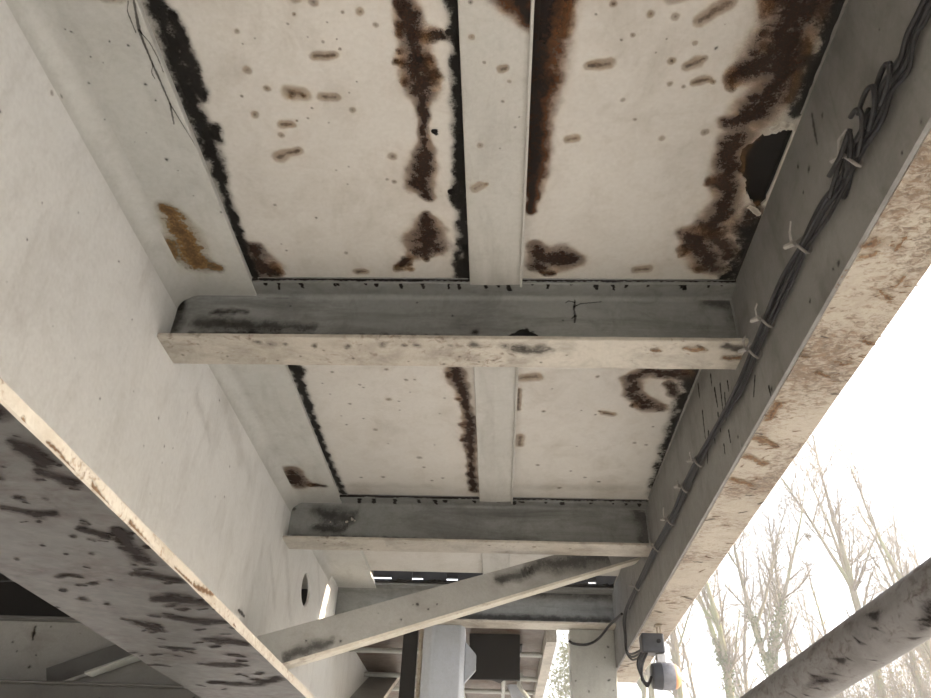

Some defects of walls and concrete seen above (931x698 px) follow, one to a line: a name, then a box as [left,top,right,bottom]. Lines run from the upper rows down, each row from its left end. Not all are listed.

crack [127,0,195,145]
leakage [170,10,210,103]
rust [248,0,470,282]
rust [493,0,575,215]
rust [522,0,834,283]
rust [156,203,224,272]
leakage [452,250,462,278]
crack [566,300,602,323]
rust [284,467,327,488]
rust [340,356,479,499]
rust [622,368,700,412]
rust [740,431,798,467]